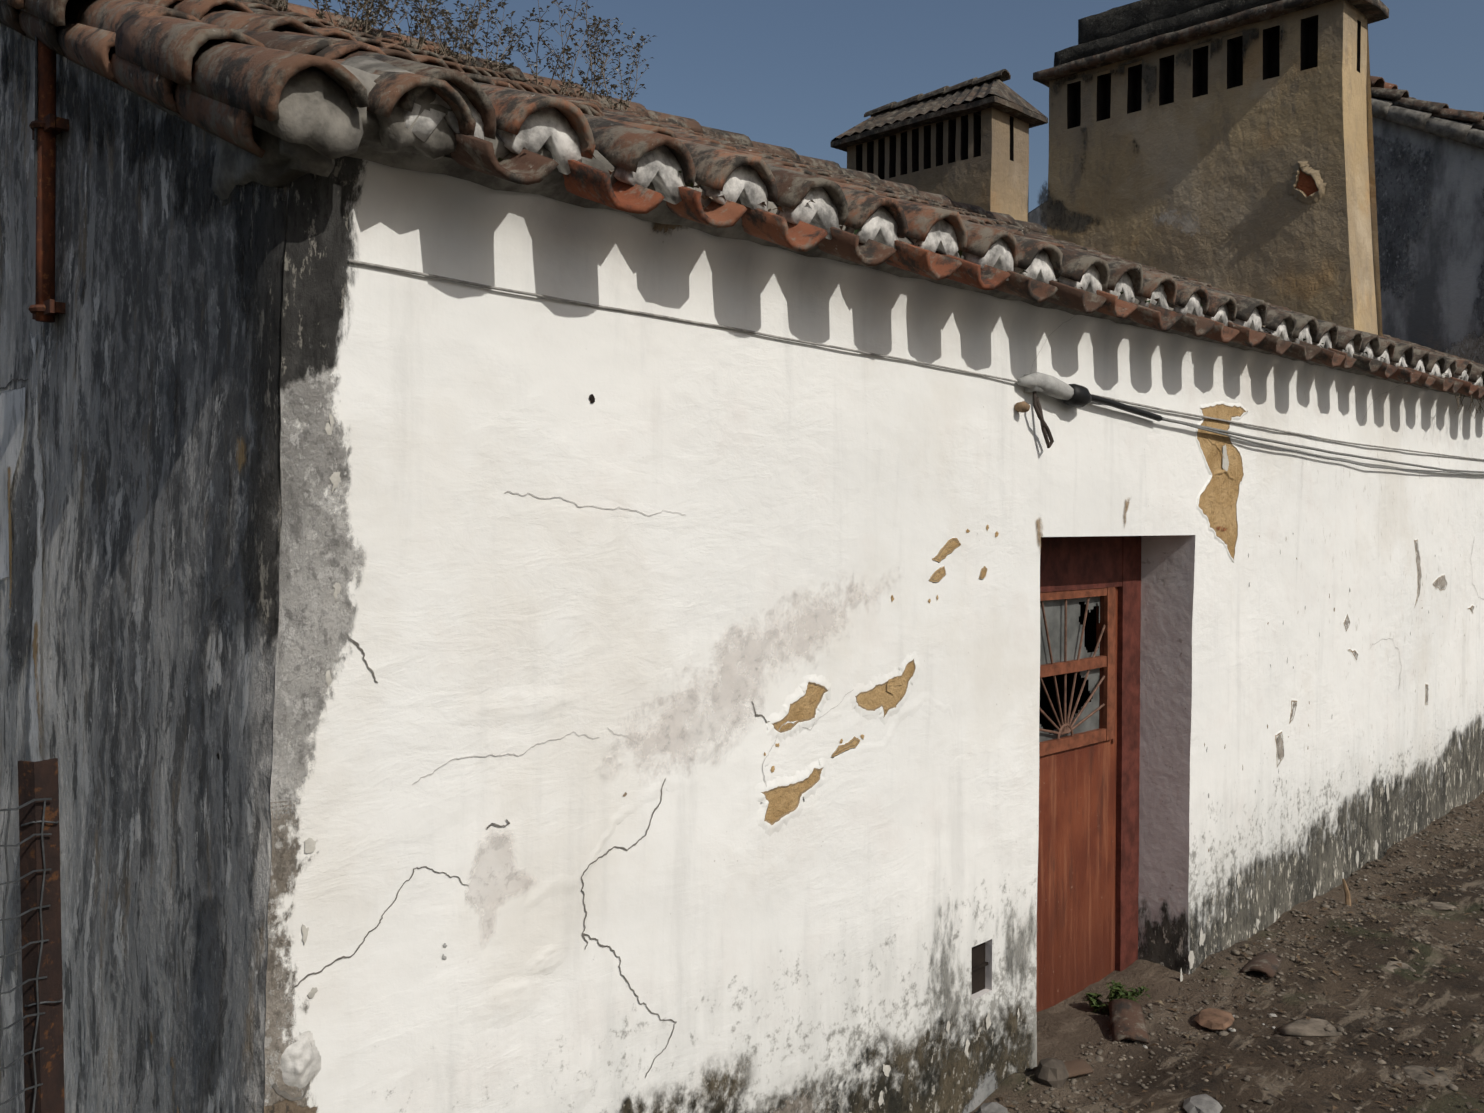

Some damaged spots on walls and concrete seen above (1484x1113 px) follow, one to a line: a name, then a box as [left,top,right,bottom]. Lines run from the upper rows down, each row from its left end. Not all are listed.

spalling [1288,161,1327,204]
water stain [1373,136,1433,298]
water stain [56,71,367,779]
peeling [928,525,999,603]
spalling [1195,401,1249,563]
peeling [264,365,364,1113]
spalling [755,651,921,836]
crack [294,866,470,987]
crack [581,778,677,1078]
water stain [620,903,1037,1113]
water stain [1138,715,1484,982]